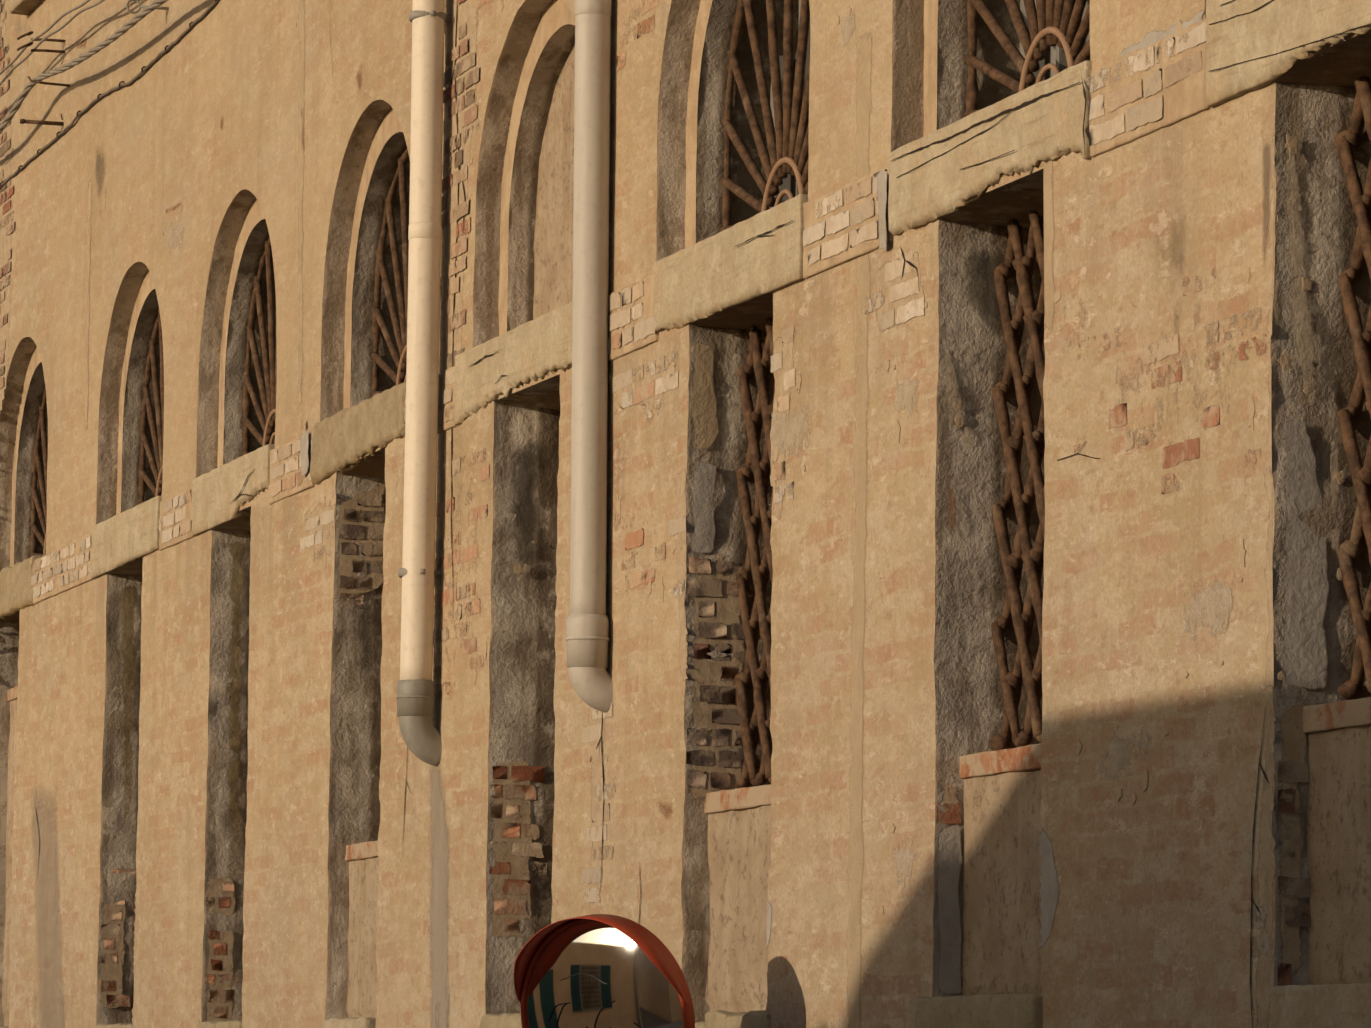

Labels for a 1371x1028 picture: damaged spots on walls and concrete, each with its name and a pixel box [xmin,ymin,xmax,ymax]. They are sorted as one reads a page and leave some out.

crack [890,76,1087,178]
flaking render [0,0,14,410]
water stain [514,444,538,561]
flaking render [1330,449,1344,508]
flaking render [489,760,547,937]